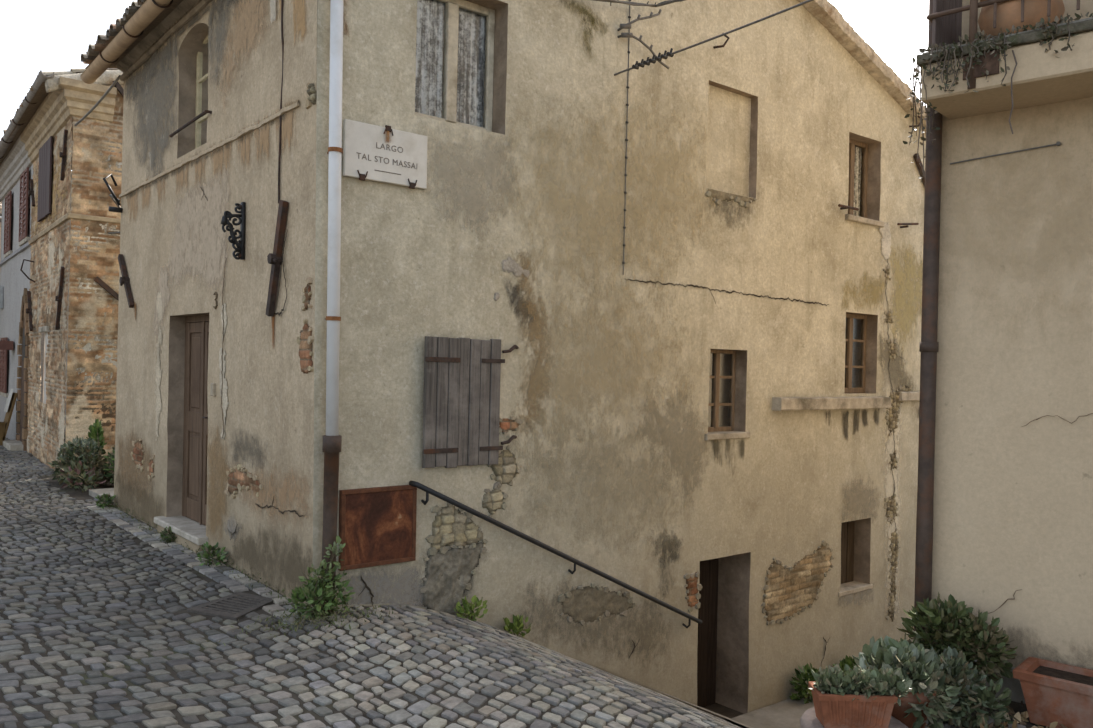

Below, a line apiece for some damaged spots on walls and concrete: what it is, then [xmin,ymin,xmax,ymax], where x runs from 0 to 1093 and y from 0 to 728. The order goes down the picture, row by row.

crack [625,279,829,306]
flaking render [297,277,314,374]
water stain [843,410,878,438]
crack [1022,413,1093,427]
flaking render [131,438,155,481]
flaking render [224,464,264,499]
crack [256,497,303,517]
spalling [419,416,523,615]
flaking render [683,571,702,613]
flaking render [761,540,834,625]